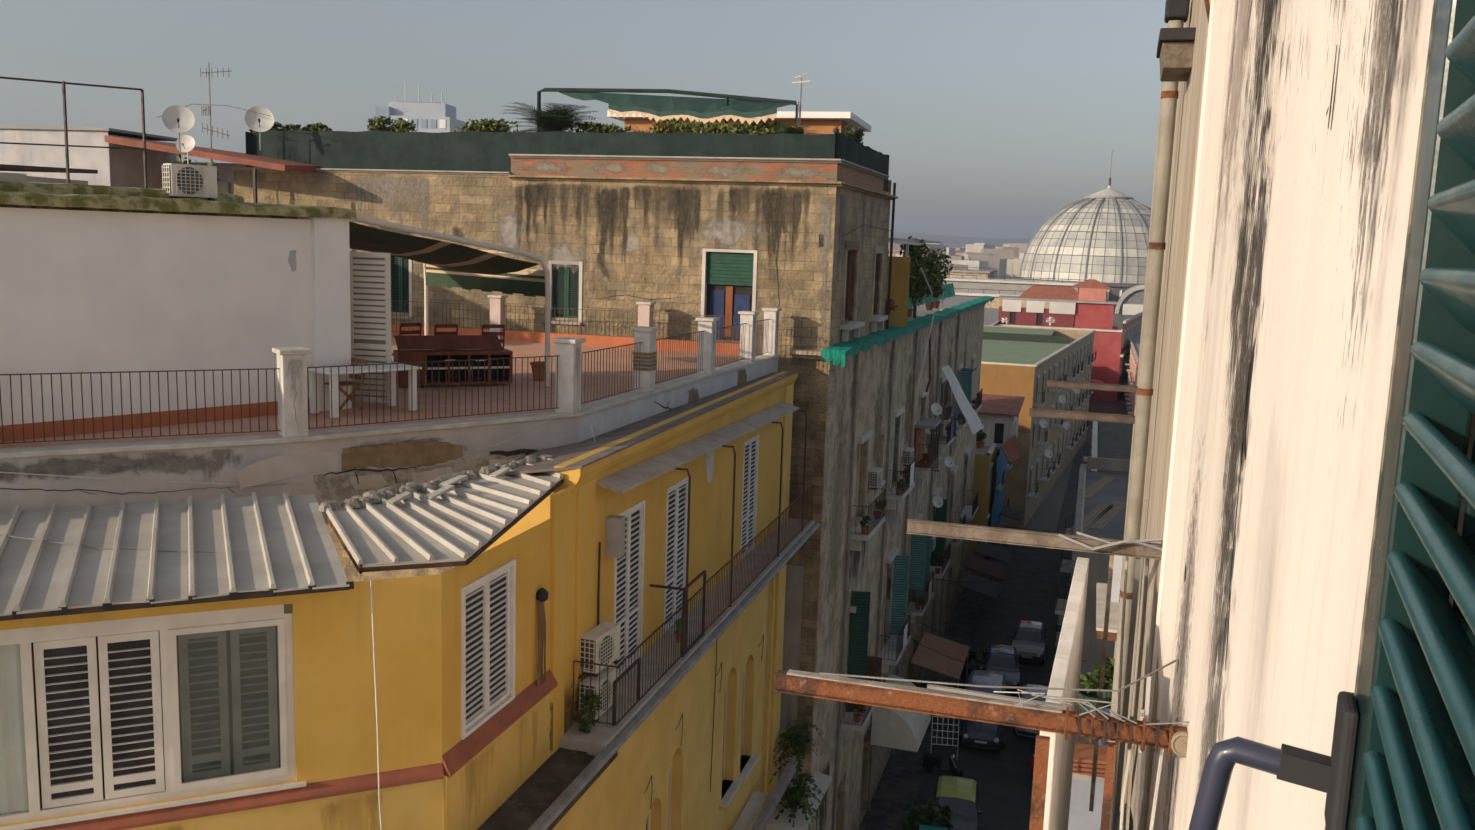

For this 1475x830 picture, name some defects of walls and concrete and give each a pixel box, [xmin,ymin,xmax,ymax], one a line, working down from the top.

water stain [516,183,873,333]
spalling [313,435,548,500]